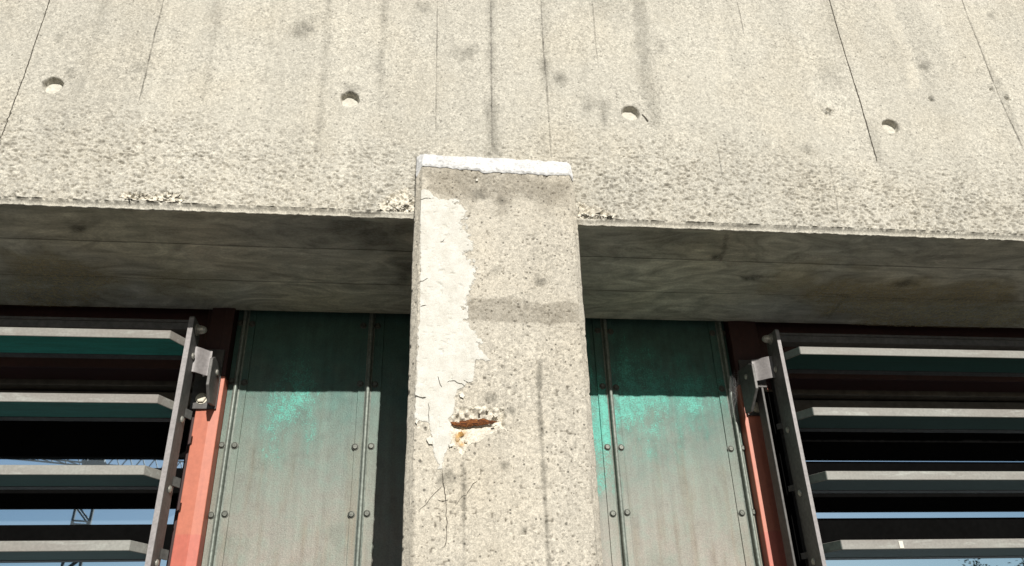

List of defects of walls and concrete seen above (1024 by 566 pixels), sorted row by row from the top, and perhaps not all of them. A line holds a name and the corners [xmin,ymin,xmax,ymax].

peeling [378,187,507,469]
crack [418,473,477,549]